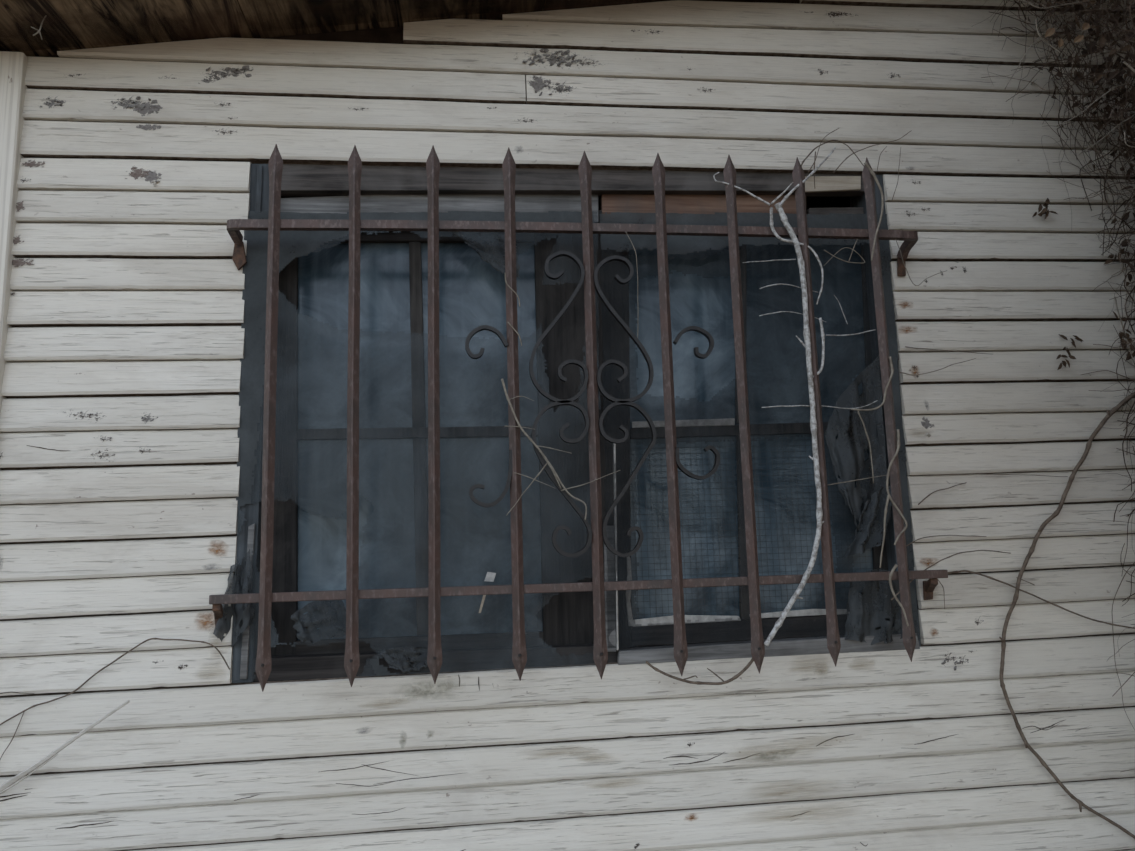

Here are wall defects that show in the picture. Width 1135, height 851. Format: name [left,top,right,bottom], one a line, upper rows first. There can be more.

peeling [203,65,252,83]
peeling [515,48,601,96]
peeling [111,96,161,130]
peeling [125,166,162,187]
crack [321,761,462,815]